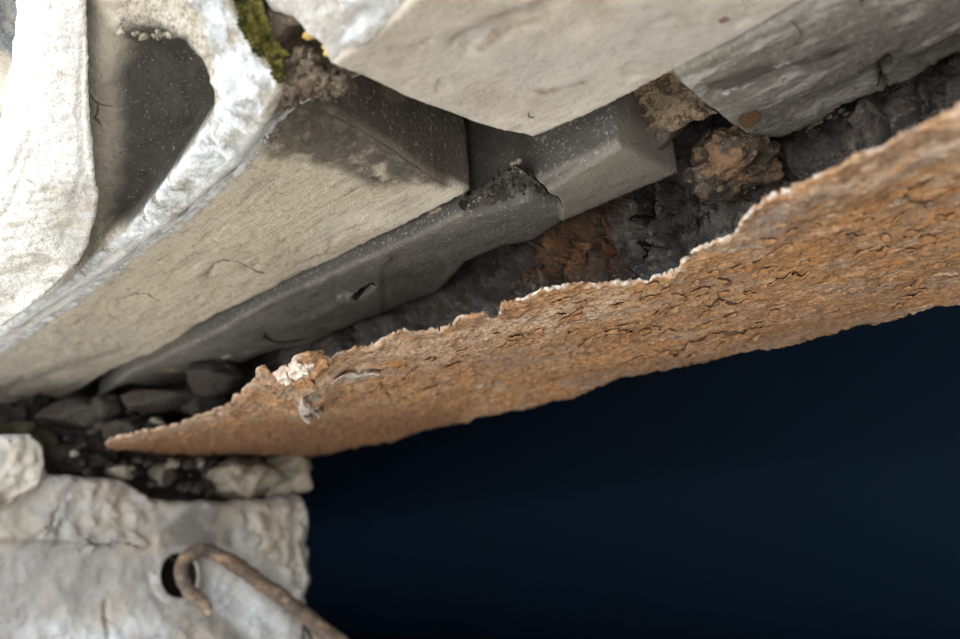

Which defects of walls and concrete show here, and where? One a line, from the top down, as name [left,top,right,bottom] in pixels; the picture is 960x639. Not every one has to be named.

spalling [458,158,562,215]
corrosion [652,111,785,254]
corrosion [519,200,633,282]
corrosion [491,213,874,356]
peeling [331,369,384,384]
peeling [298,395,326,424]
spalling [0,437,44,502]